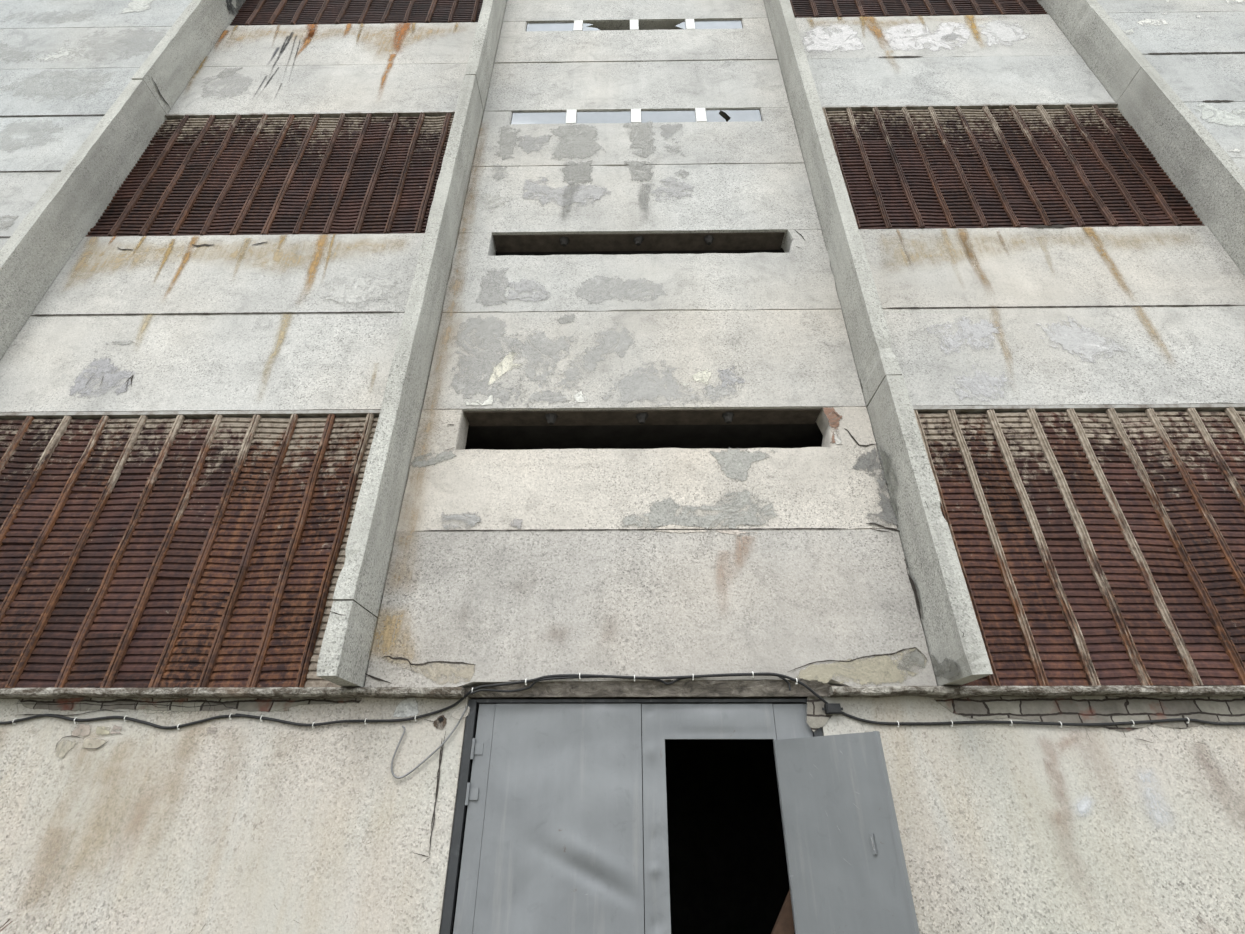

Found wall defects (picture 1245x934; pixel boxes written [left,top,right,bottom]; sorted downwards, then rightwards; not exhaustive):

peeling [495,124,604,160]
peeling [624,121,684,157]
rust [75,236,201,283]
rust [225,234,361,283]
rust [897,229,986,282]
rust [1083,227,1124,286]
peeling [576,276,665,304]
rust [269,313,291,363]
peeling [451,268,634,408]
peeling [604,364,744,406]
peeling [622,448,777,535]
crack [866,523,921,619]